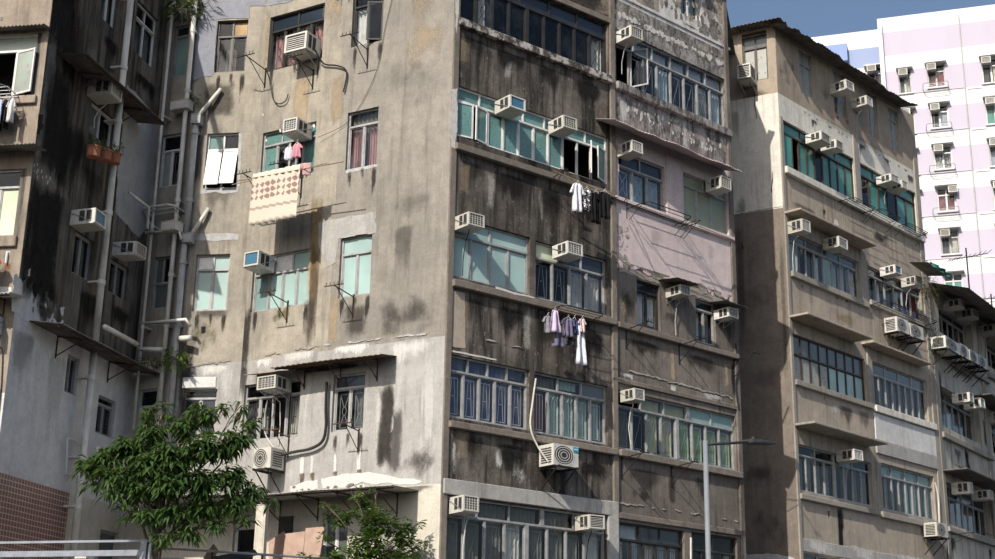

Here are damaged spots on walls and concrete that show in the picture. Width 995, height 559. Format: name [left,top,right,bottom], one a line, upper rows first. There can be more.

damp [571,0,601,10]
peeling [614,0,724,69]
damp [498,51,524,69]
damp [575,80,599,100]
damp [498,307,523,334]
damp [584,330,603,355]
damp [632,340,657,354]
damp [389,339,434,439]
damp [725,365,735,392]
damp [376,384,401,469]
damp [496,444,524,478]
damp [580,461,605,479]